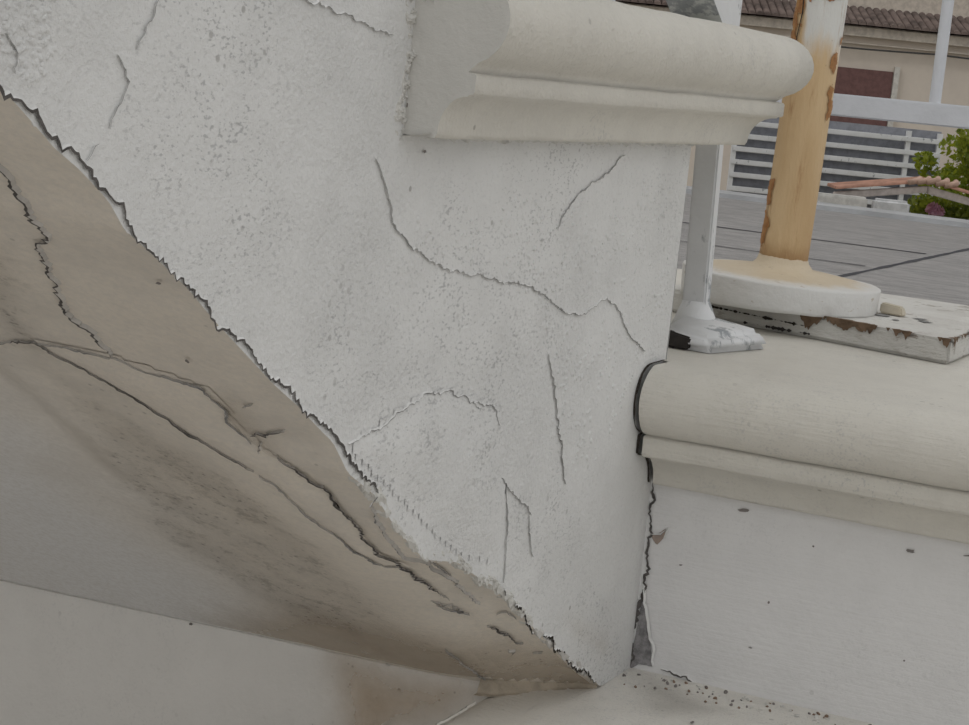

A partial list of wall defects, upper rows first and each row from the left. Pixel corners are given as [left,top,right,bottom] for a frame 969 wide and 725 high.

corrosion [791,0,812,40]
corrosion [830,37,842,74]
corrosion [826,86,834,121]
corrosion [760,178,775,246]
crack [0,0,596,683]
crack [376,154,664,666]
crack [436,649,486,725]
crack [660,668,696,683]